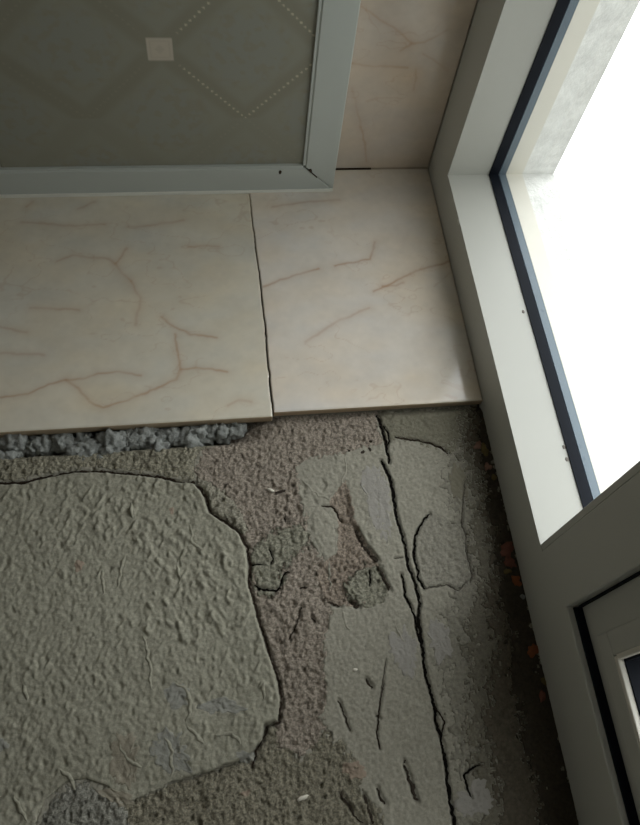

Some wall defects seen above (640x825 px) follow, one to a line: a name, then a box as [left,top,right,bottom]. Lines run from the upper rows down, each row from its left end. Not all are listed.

spalling [123,411,391,825]
spalling [403,760,418,801]
crack [376,415,480,825]
spalling [413,510,471,590]